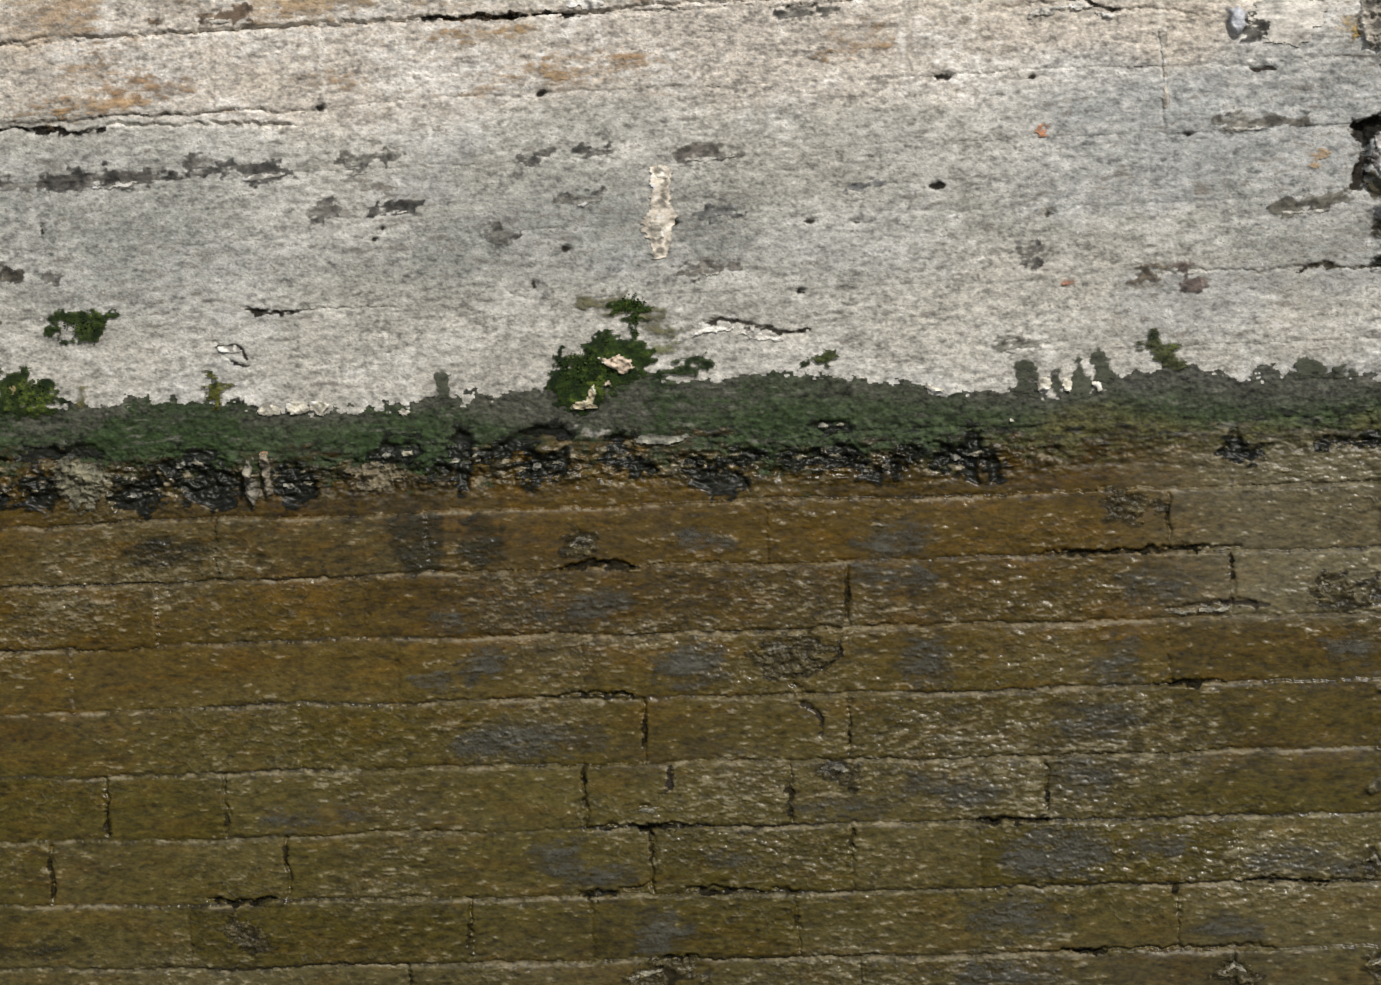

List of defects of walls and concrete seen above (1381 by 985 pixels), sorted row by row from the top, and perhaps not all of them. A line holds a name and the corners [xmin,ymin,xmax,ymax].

crack [1028,0,1121,19]
crack [0,125,106,137]
peeling [640,141,746,259]
spalling [676,256,742,283]
crack [1297,261,1381,273]
crack [692,316,811,342]
spalling [0,439,324,522]
spalling [344,408,577,497]
spalling [597,427,690,479]
spalling [681,419,1015,502]
crack [579,690,685,861]